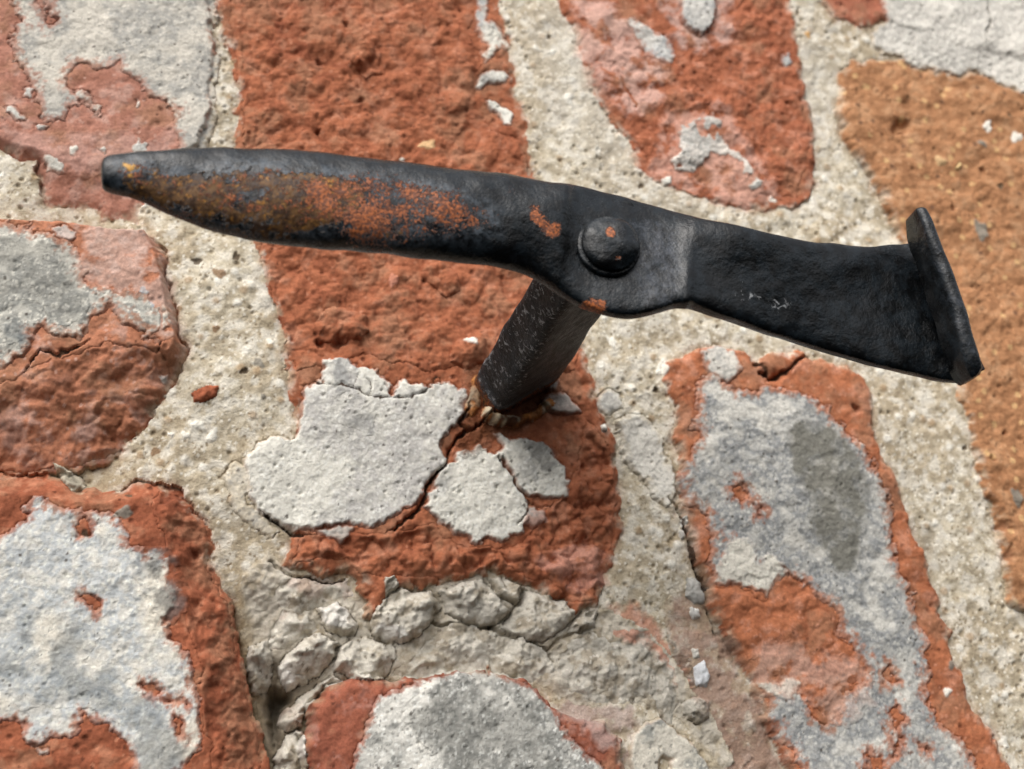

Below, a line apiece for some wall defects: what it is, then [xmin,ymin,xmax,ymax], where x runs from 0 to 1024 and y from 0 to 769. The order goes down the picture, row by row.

spalling [229,0,530,178]
spalling [599,0,810,198]
peeling [51,224,77,242]
spalling [0,341,175,476]
spalling [259,242,533,373]
crack [394,406,494,532]
spalling [563,347,581,374]
crack [289,574,345,585]
spalling [152,419,735,769]
crack [489,583,536,643]
crack [668,497,714,634]
spalling [704,576,854,663]